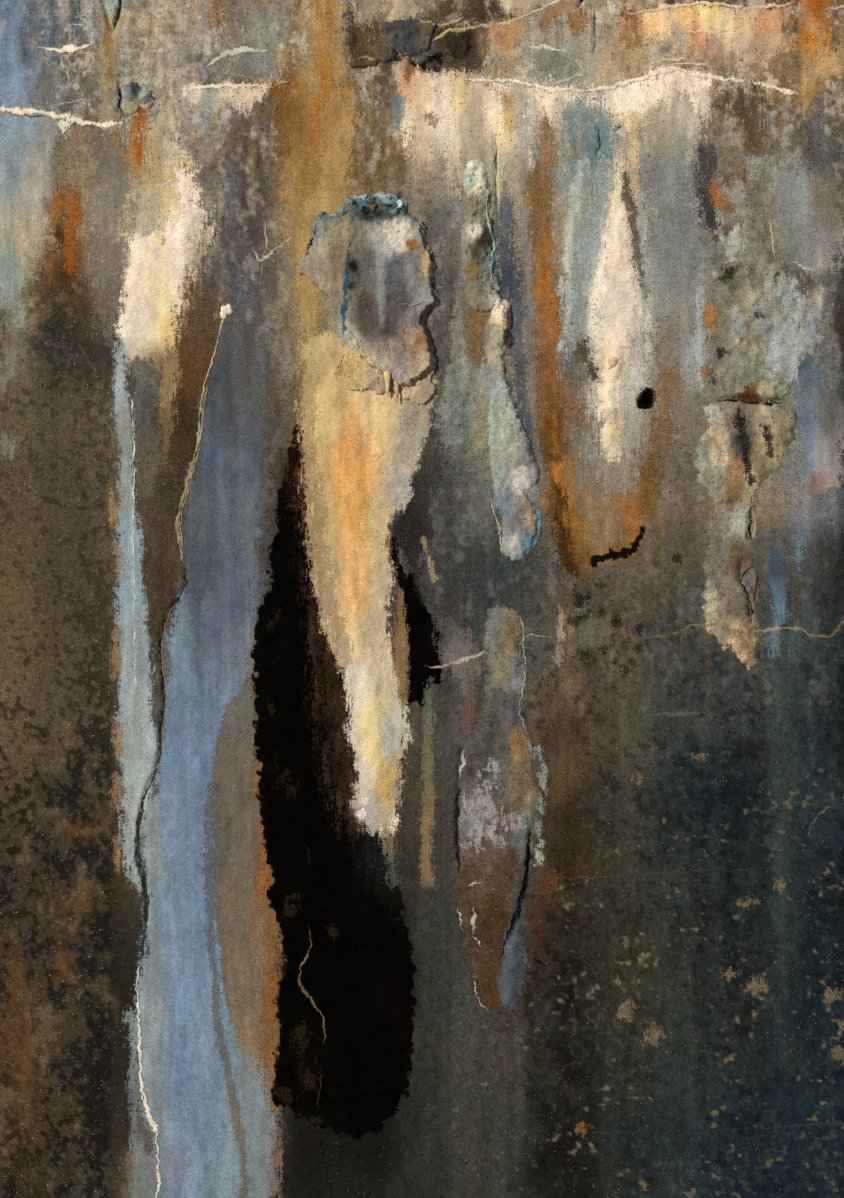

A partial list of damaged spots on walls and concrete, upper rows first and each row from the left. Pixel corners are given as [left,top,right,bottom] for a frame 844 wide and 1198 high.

crack [0,99,123,139]
spalling [341,5,494,78]
crack [649,62,708,70]
rust [790,0,844,117]
rust [261,0,368,374]
rust [522,114,683,886]
damp [0,0,294,1198]
crack [639,620,844,663]
crack [134,317,224,1198]